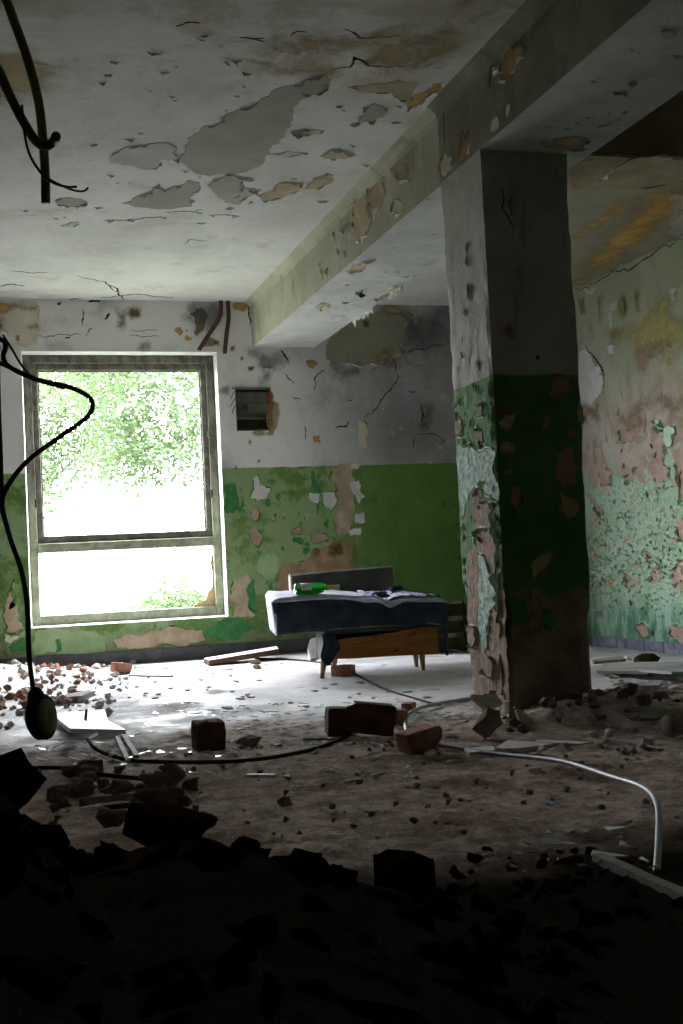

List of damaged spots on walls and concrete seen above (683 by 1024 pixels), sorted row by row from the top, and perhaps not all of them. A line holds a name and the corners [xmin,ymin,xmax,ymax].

crack [239,31,305,42]
crack [330,29,409,70]
peeling [54,59,370,228]
peeling [336,80,444,128]
leakage [567,189,678,288]
crack [40,276,173,339]
crack [336,344,448,446]
peeling [2,462,365,656]
peeling [451,382,524,702]
peeling [554,417,683,643]